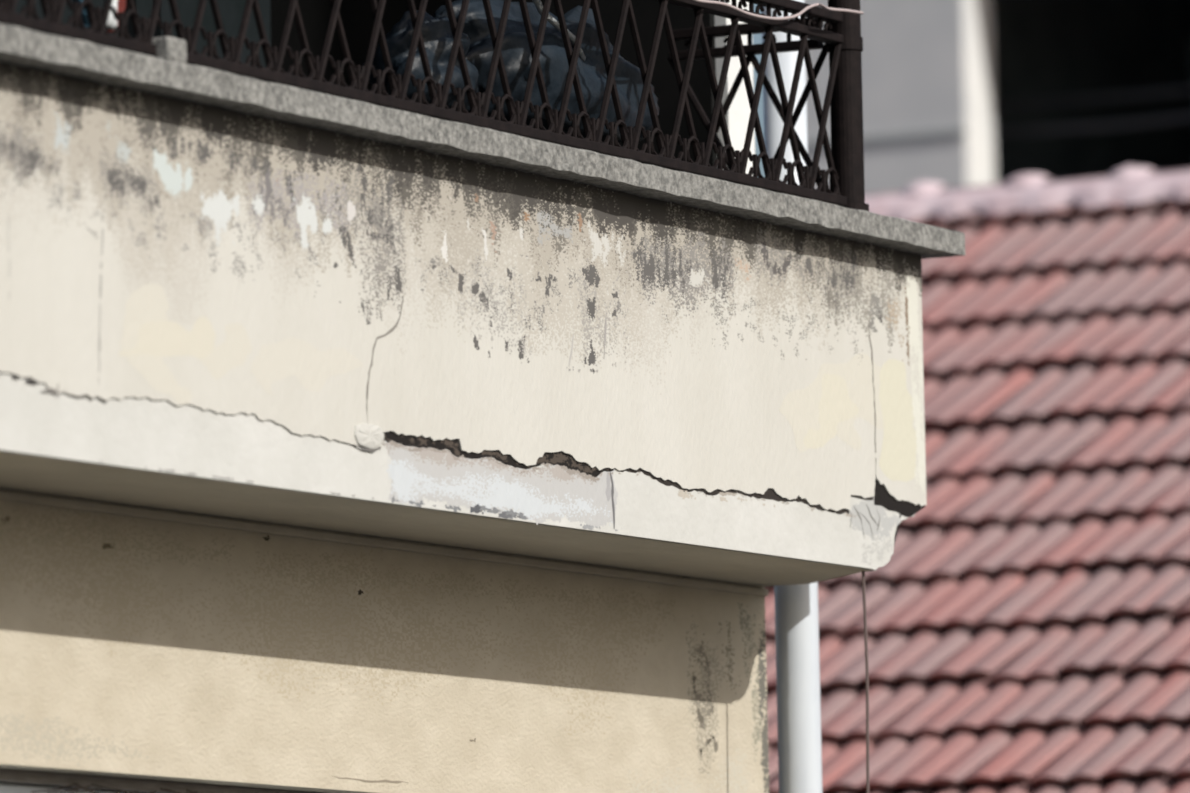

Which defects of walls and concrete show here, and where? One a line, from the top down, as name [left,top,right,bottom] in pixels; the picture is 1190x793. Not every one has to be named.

leakage [0,503,676,736]
leakage [0,62,923,482]
crack [0,214,925,539]
spalling [382,435,621,530]
leakage [625,603,769,793]
spalling [845,499,901,565]